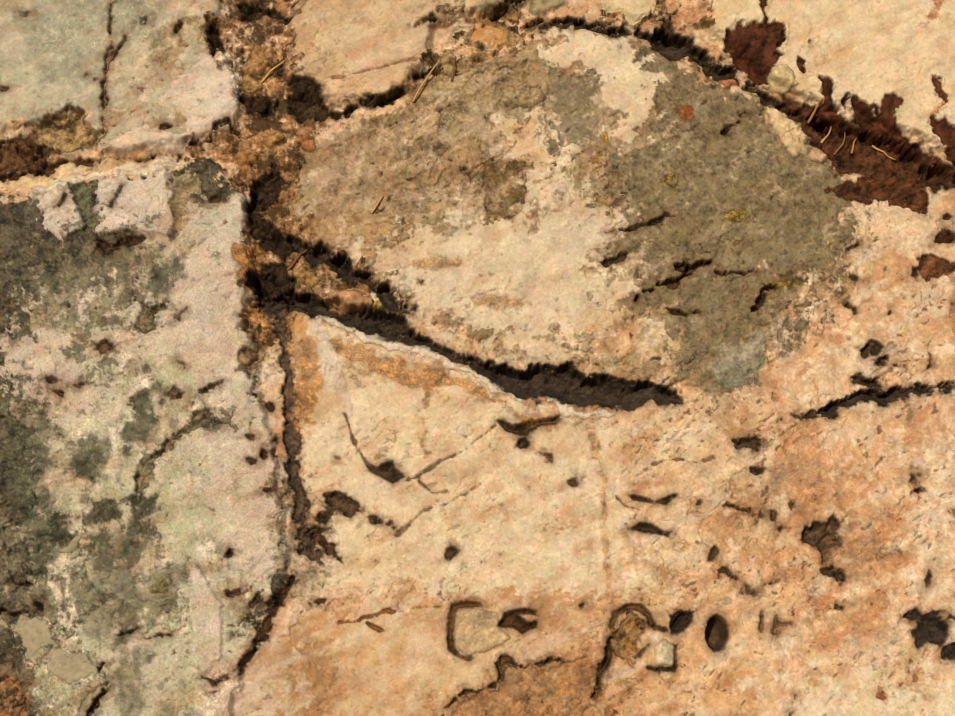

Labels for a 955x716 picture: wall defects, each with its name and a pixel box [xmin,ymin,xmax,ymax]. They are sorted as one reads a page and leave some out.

peeling [723,0,786,87]
crack [323,59,433,120]
crack [491,0,955,193]
peeling [808,76,918,163]
peeling [930,115,955,166]
peeling [825,170,928,214]
leakage [146,257,185,298]
leakage [124,382,161,452]
crack [780,373,955,420]
leakage [9,410,64,579]
leakage [68,438,111,490]
crack [202,235,683,686]